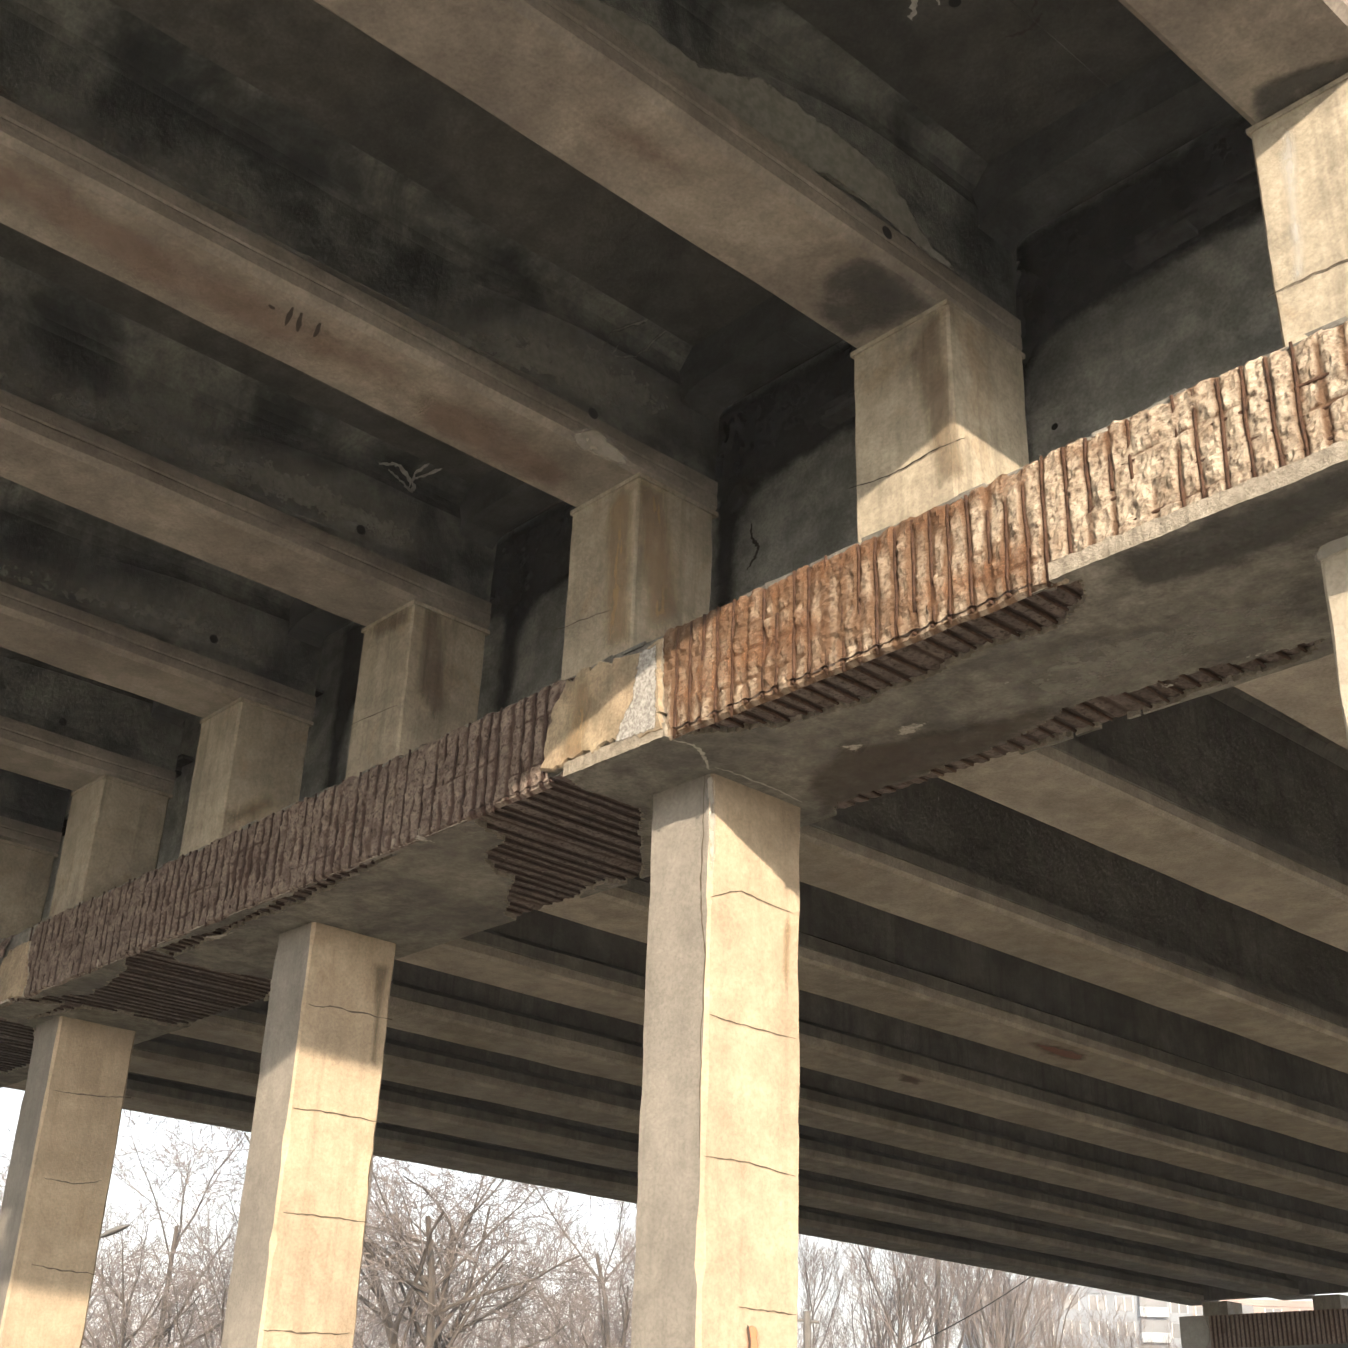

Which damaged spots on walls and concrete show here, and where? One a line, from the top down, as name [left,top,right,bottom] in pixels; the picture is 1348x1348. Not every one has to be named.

crack [907,0,940,20]
leakage [822,262,961,474]
crack [849,438,965,489]
spalling [616,321,1348,742]
spalling [835,641,1314,809]
spalling [0,677,643,1072]
crack [673,740,802,1176]